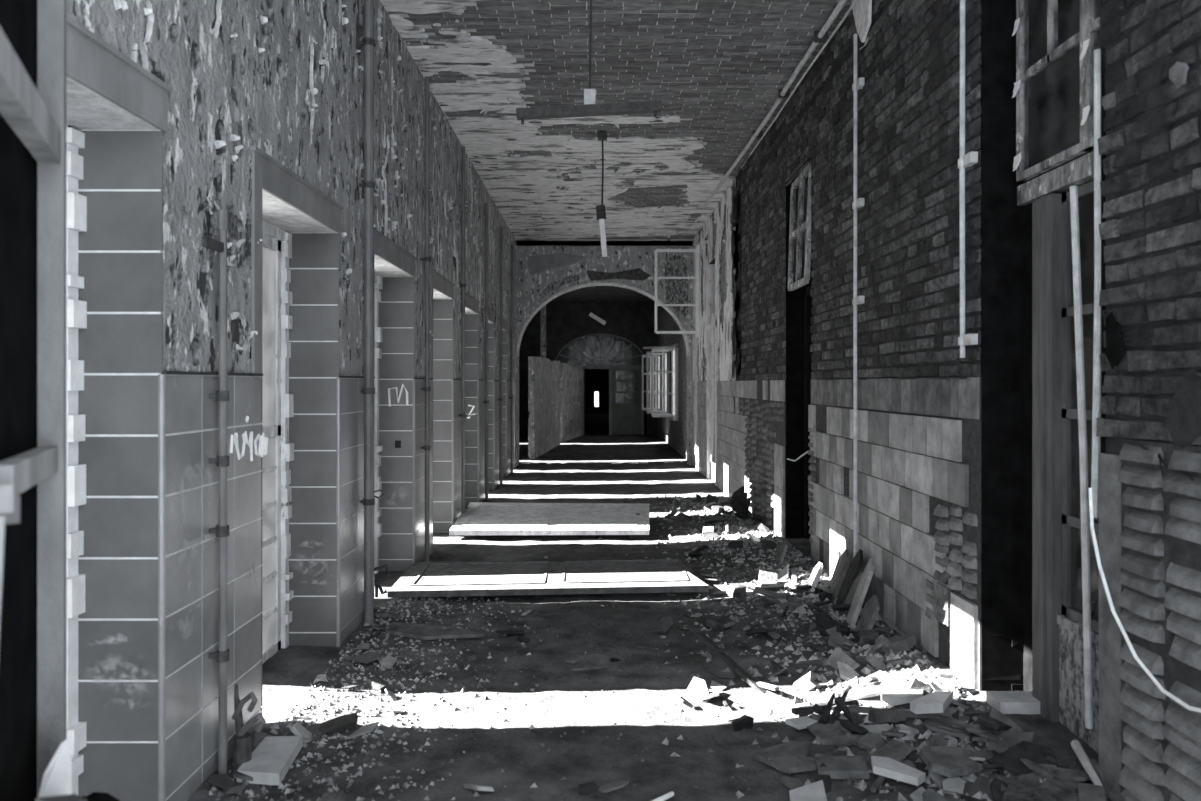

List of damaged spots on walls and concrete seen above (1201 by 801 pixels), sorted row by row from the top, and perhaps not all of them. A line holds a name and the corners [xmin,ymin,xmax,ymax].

spalling [130,0,154,71]
spalling [258,0,274,85]
spalling [199,0,262,308]
spalling [305,0,872,455]
spalling [230,311,258,379]
spalling [1105,312,1125,370]
peeling [925,498,979,629]